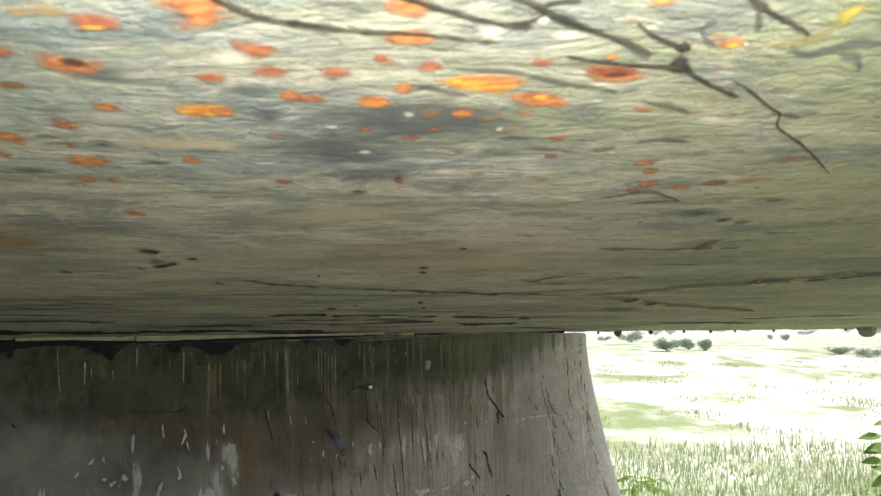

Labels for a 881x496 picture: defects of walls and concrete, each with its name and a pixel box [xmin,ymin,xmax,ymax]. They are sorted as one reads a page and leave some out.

rust [72,14,117,30]
rust [162,0,219,24]
rust [388,0,427,17]
rust [591,54,643,82]
rust [443,75,566,107]
crack [213,0,829,174]
rust [179,105,232,116]
damp [142,335,494,496]
peeling [402,395,487,468]
crack [484,379,505,424]
peeling [102,465,142,496]
peeling [198,444,238,496]